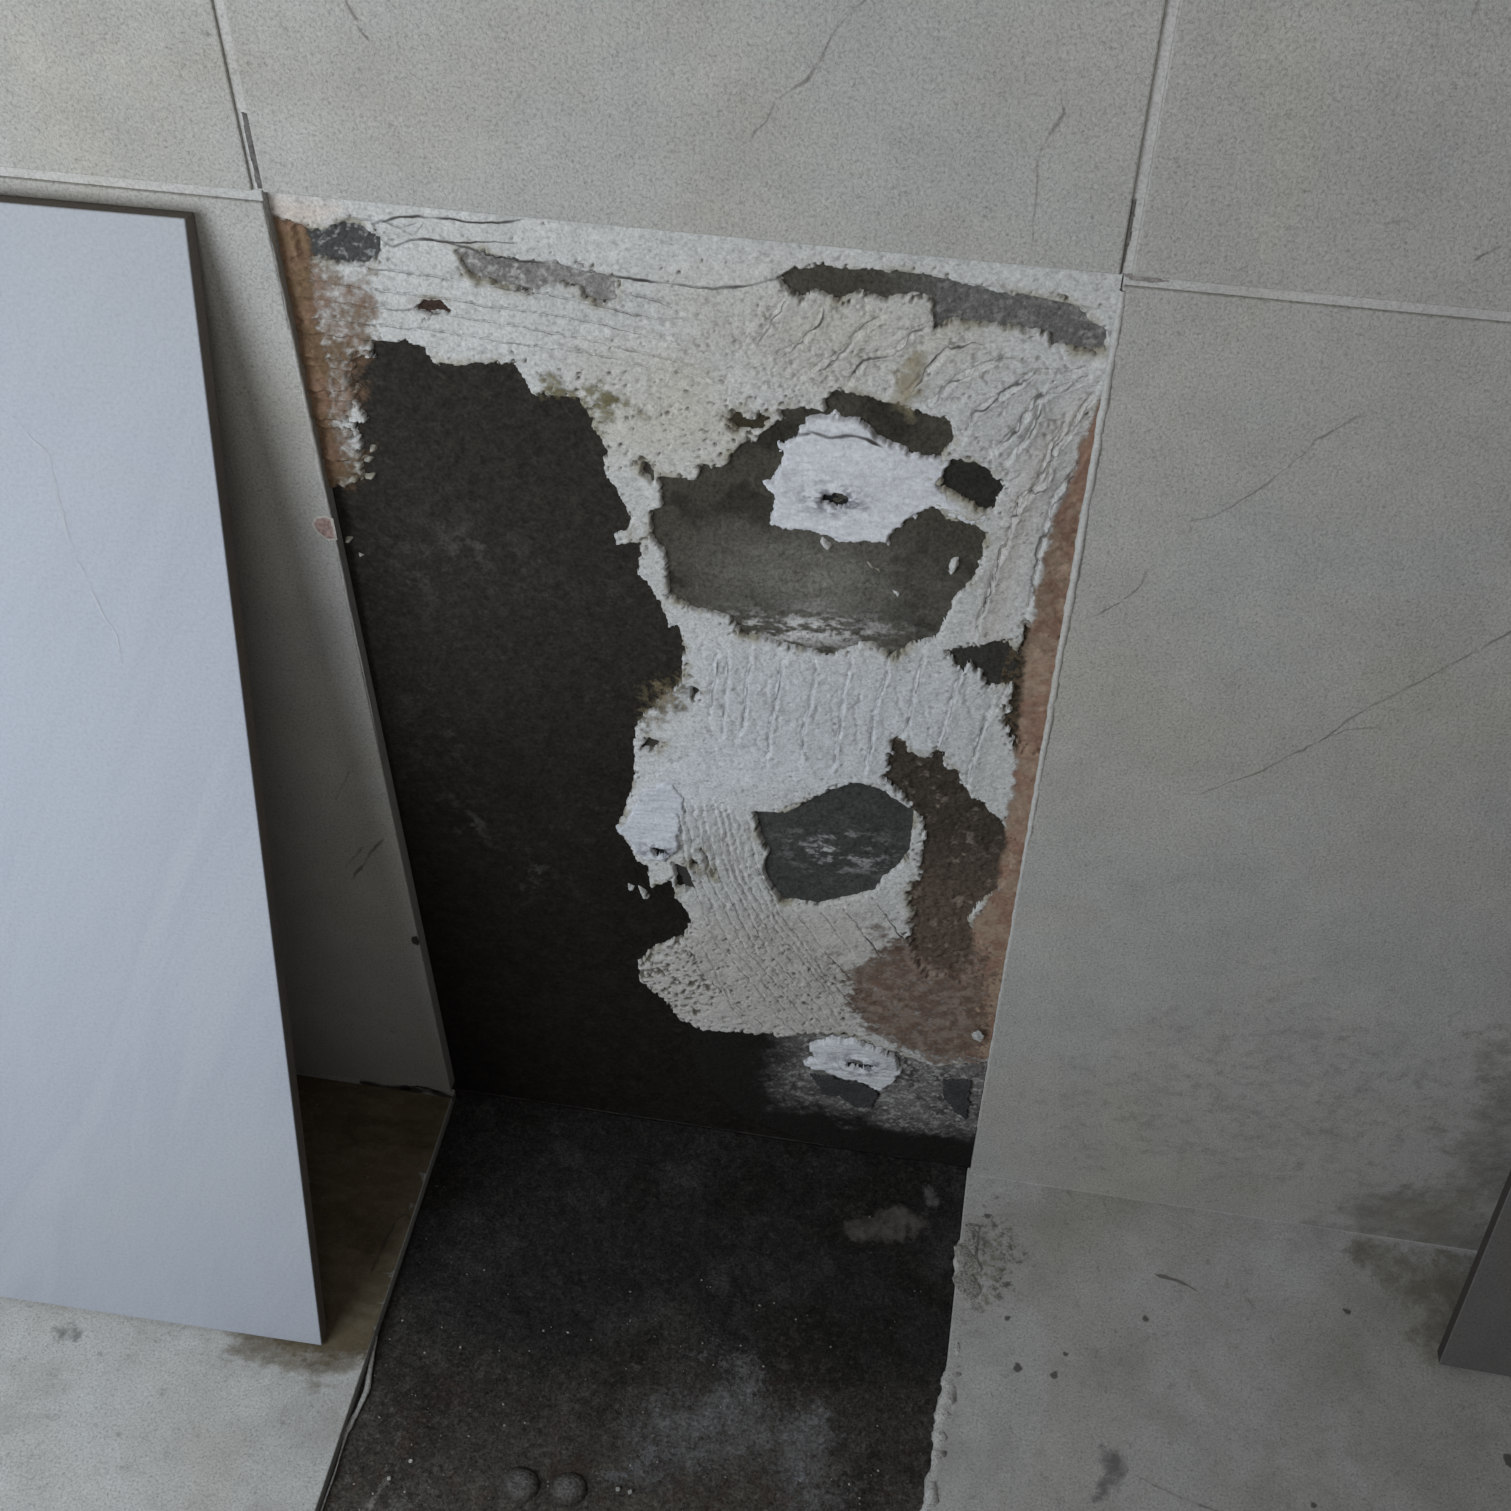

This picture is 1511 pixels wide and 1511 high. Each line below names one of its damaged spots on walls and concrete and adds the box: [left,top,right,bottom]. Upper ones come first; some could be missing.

spalling [295,221,381,263]
spalling [456,247,617,303]
spalling [418,299,451,312]
spalling [781,261,1107,349]
peeling [312,515,364,557]
spalling [649,390,1026,686]
spalling [756,736,1007,972]
peeling [628,883,650,899]
spalling [687,1022,988,1167]